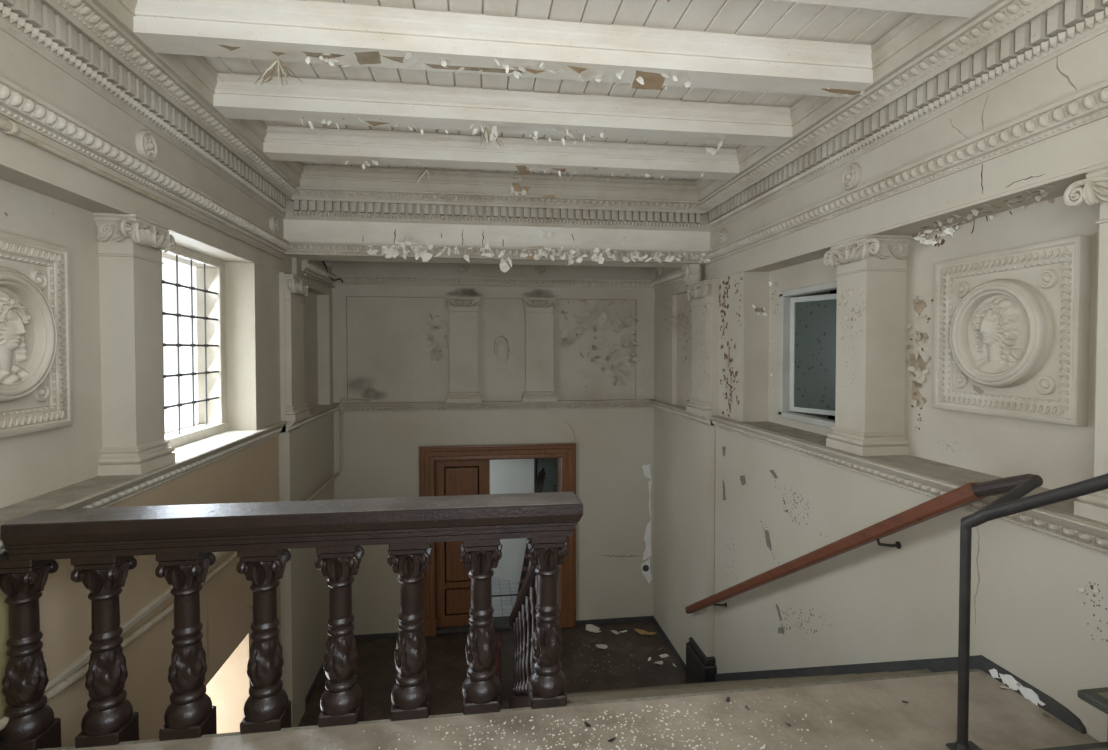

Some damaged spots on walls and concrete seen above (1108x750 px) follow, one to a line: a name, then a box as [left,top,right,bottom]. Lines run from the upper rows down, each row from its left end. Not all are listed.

peeling [302,51,692,91]
crack [1056,56,1077,91]
flaking render [911,186,1055,247]
peeling [367,236,712,272]
peeling [718,273,778,417]
peeling [905,296,934,432]
flaking render [641,464,652,583]
peeling [776,604,832,634]